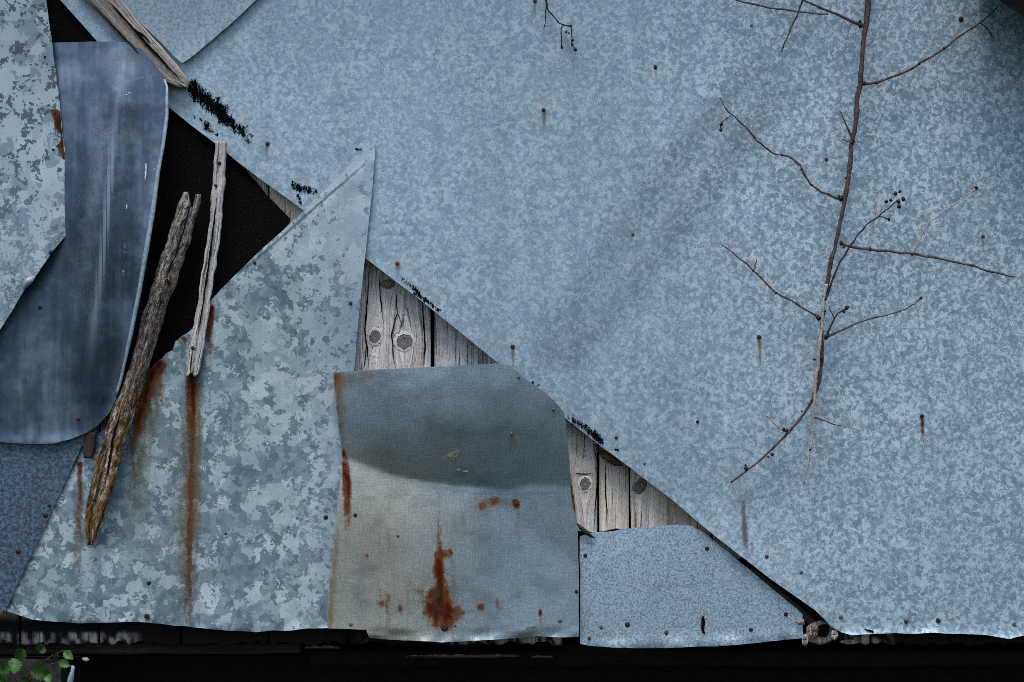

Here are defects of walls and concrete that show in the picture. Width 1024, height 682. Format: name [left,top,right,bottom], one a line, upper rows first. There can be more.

corrosion [51,109,65,159]
corrosion [130,360,166,497]
corrosion [183,373,201,620]
corrosion [342,448,351,523]
corrosion [417,534,465,630]